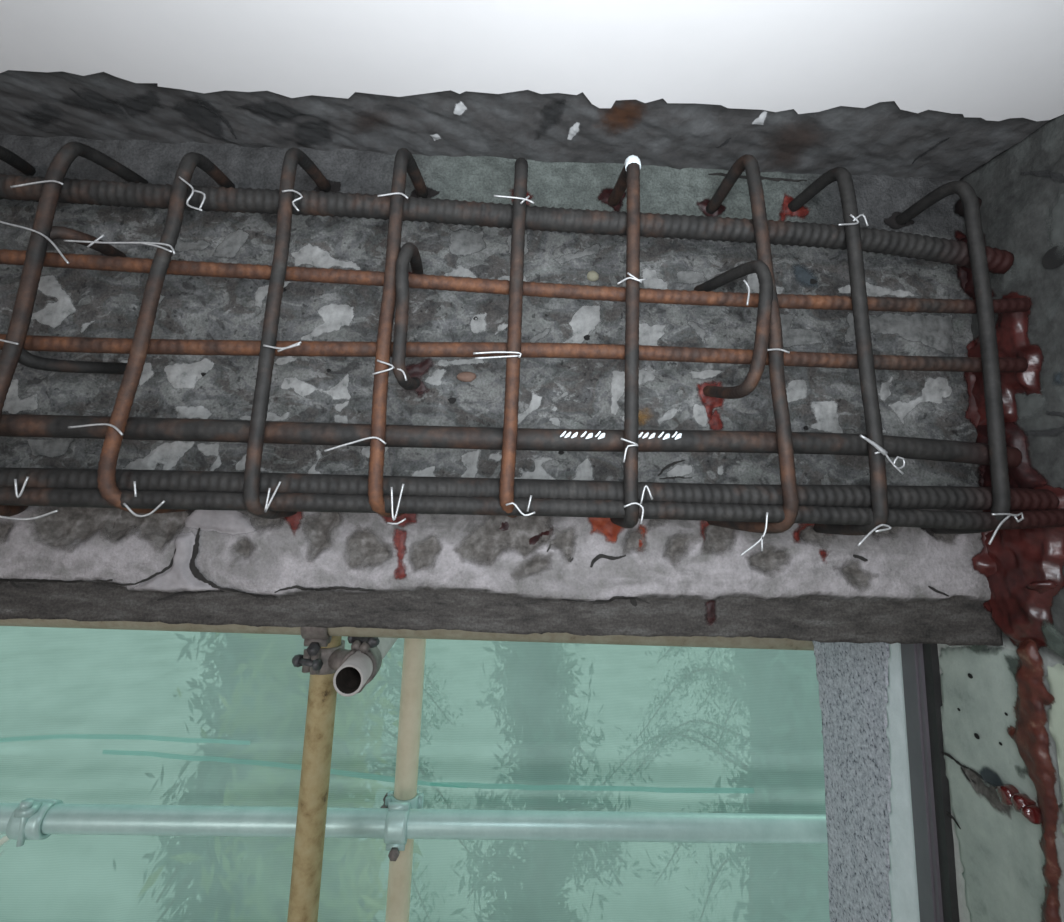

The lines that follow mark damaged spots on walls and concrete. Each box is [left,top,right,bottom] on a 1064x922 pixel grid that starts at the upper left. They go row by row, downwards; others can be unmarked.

flaking render [0,70,1050,181]
peeling [563,304,601,343]
peeling [281,374,351,423]
peeling [657,404,710,427]
peeling [803,401,843,433]
peeling [460,449,502,478]
spalling [31,507,283,558]
crack [0,528,375,601]
spalling [346,528,392,568]
spalling [410,535,441,570]
spalling [456,515,576,577]
crack [562,596,650,607]